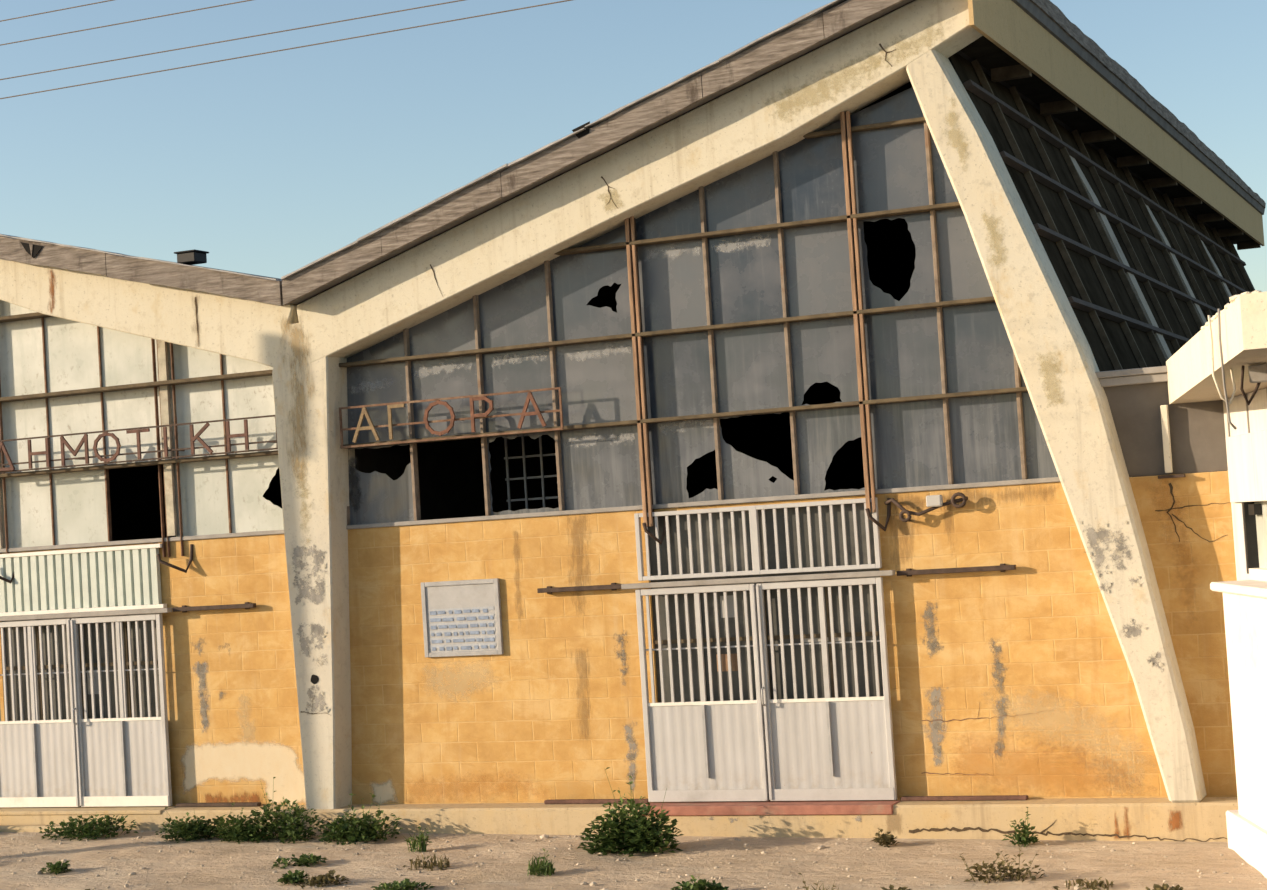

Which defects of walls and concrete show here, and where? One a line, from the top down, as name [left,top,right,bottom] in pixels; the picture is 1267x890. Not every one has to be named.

crack [1155,483,1229,542]
peeling [289,545,327,606]
peeling [1079,521,1140,593]
peeling [297,624,329,712]
water stain [182,742,306,805]